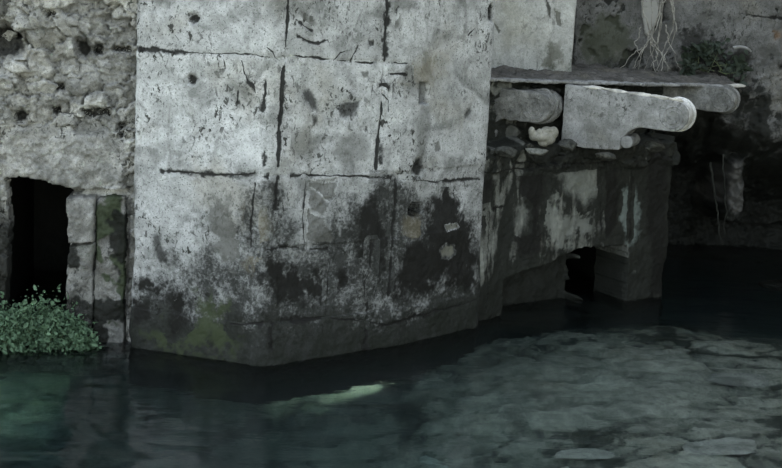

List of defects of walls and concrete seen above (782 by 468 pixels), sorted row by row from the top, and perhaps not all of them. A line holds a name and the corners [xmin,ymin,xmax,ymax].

spalling [42,8,59,21]
spalling [0,19,33,64]
spalling [72,36,135,60]
spalling [9,106,31,124]
spalling [48,79,67,118]
spalling [79,105,127,140]
damp [148,229,171,266]
damp [194,185,280,286]
damp [397,204,424,253]
damp [480,155,624,282]
damp [640,138,679,298]
damp [130,283,197,346]